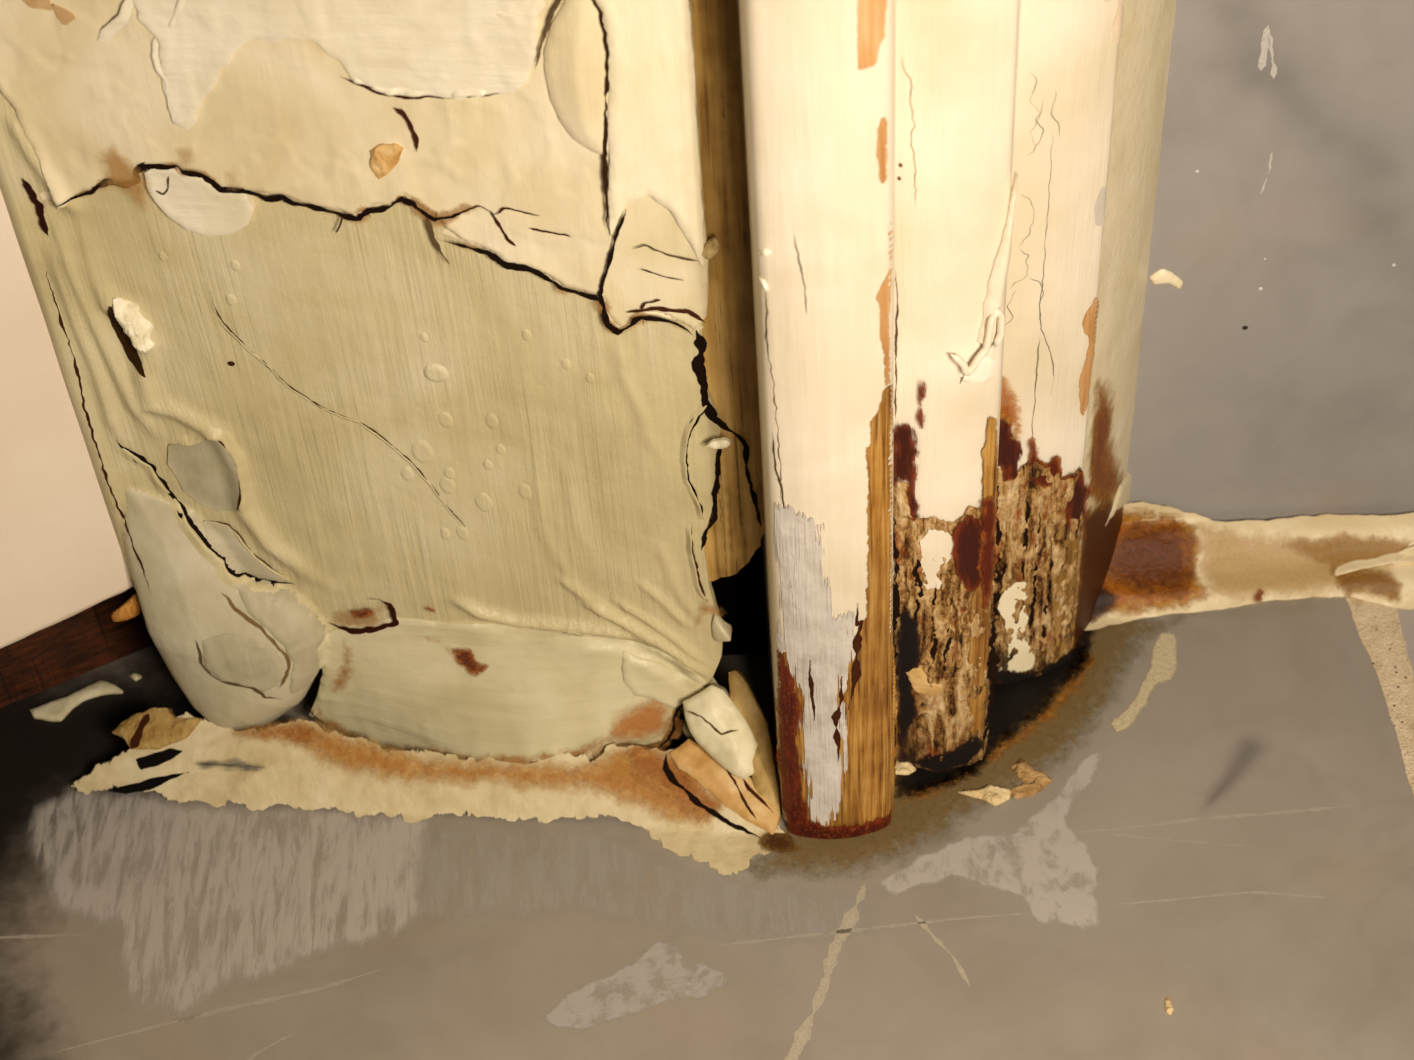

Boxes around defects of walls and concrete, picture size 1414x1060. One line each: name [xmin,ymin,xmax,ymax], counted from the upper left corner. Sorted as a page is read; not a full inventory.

peeling [342,75,500,100]
crack [23,0,785,602]
rust [893,382,926,521]
rust [951,496,998,610]
rust [998,377,1206,649]
rust [238,700,720,824]
peeling [683,539,897,852]
leakage [750,619,1163,877]